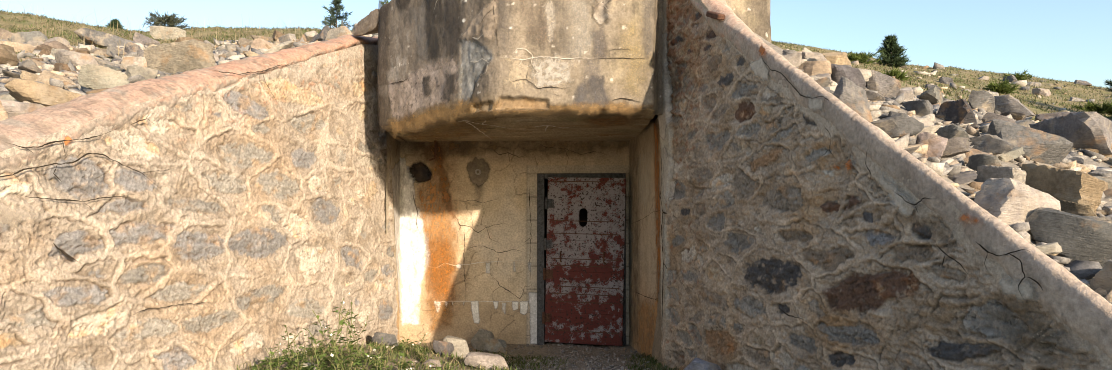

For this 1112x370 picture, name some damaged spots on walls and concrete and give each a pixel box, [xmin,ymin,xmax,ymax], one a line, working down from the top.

leakage [377,0,460,130]
crack [762,58,829,101]
crack [0,116,169,209]
leakage [392,157,428,324]
crack [435,188,532,323]
corrosion [390,100,633,330]
leakage [461,139,649,334]
corrosion [647,105,661,294]
crack [938,241,1043,296]